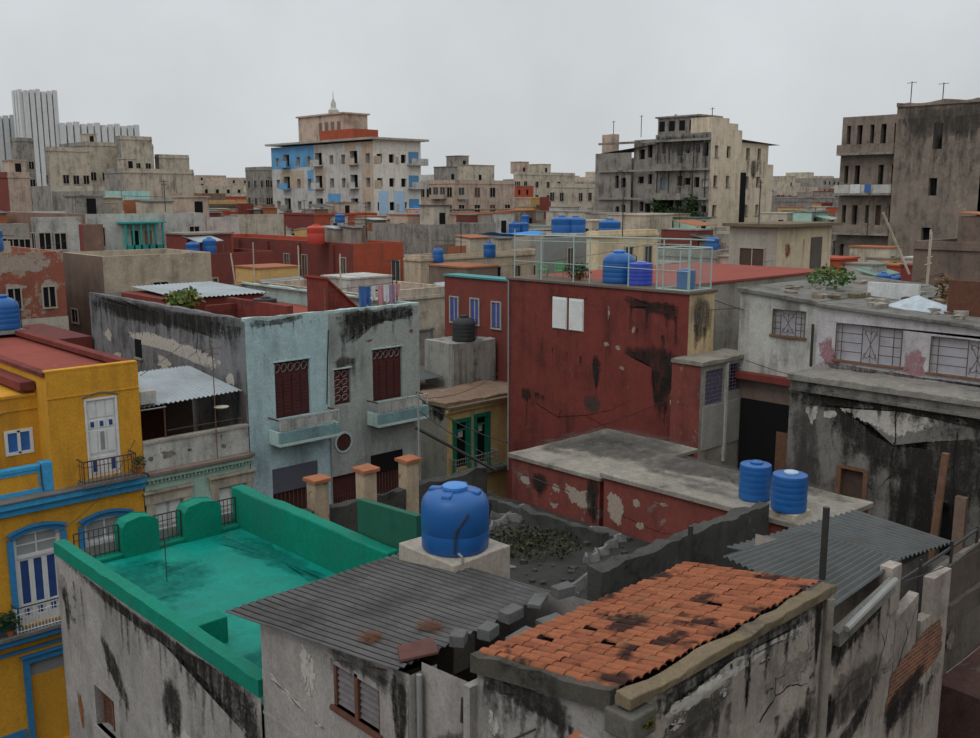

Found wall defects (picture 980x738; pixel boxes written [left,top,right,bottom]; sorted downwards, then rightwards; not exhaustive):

peeling [0,255,58,290]
water stain [336,306,413,368]
water stain [628,296,677,343]
peeling [819,337,840,367]
peeling [889,350,925,376]
water stain [791,393,980,534]
peeling [550,484,595,510]
peeling [607,492,641,526]
water stain [62,569,258,738]
flaking render [884,619,943,728]
water stain [483,676,572,738]
crack [760,678,807,722]